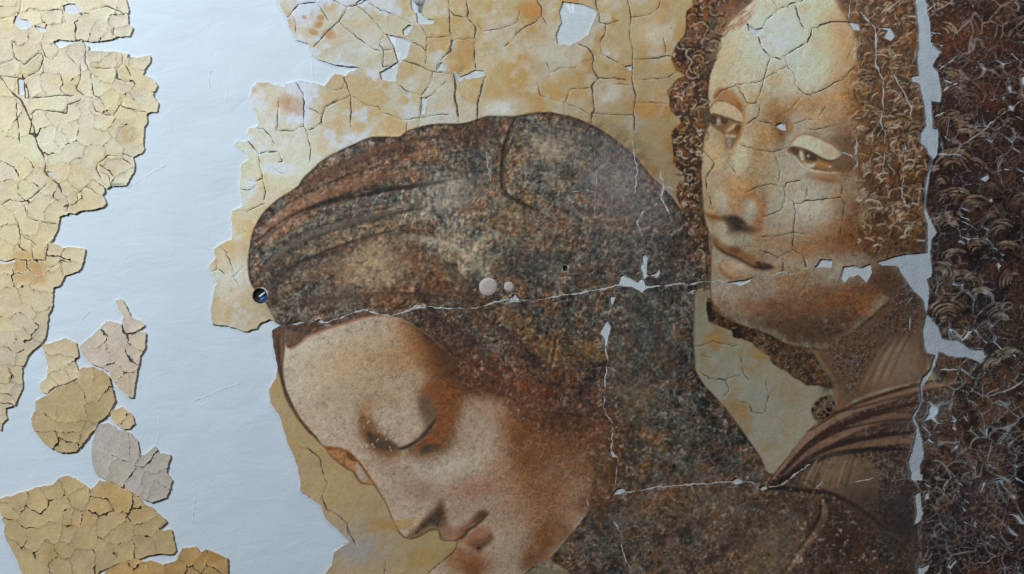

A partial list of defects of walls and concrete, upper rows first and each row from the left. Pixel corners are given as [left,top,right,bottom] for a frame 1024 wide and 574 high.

crack [0,5,154,406]
crack [6,451,170,574]
peeling [0,0,228,574]
crack [232,0,546,231]
crack [282,284,621,327]
peeling [555,1,597,45]
crack [538,0,678,235]
crack [654,280,726,295]
crack [603,340,823,493]
crack [705,0,958,276]
peeling [814,0,1024,574]
crack [939,102,1019,156]